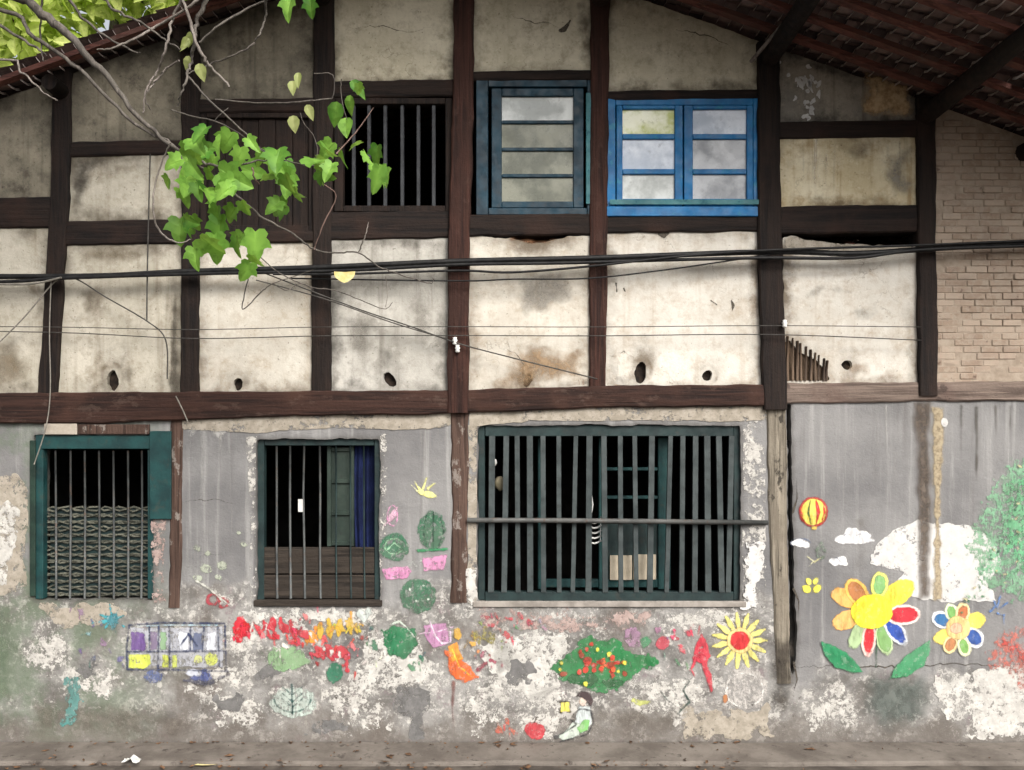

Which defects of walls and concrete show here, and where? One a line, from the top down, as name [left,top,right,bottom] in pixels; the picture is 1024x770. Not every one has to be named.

peeling [785,236,909,251]
peeling [0,473,28,596]
water stain [915,404,943,600]
peeling [870,519,1001,603]
peeling [24,602,127,708]
peeling [462,568,651,741]